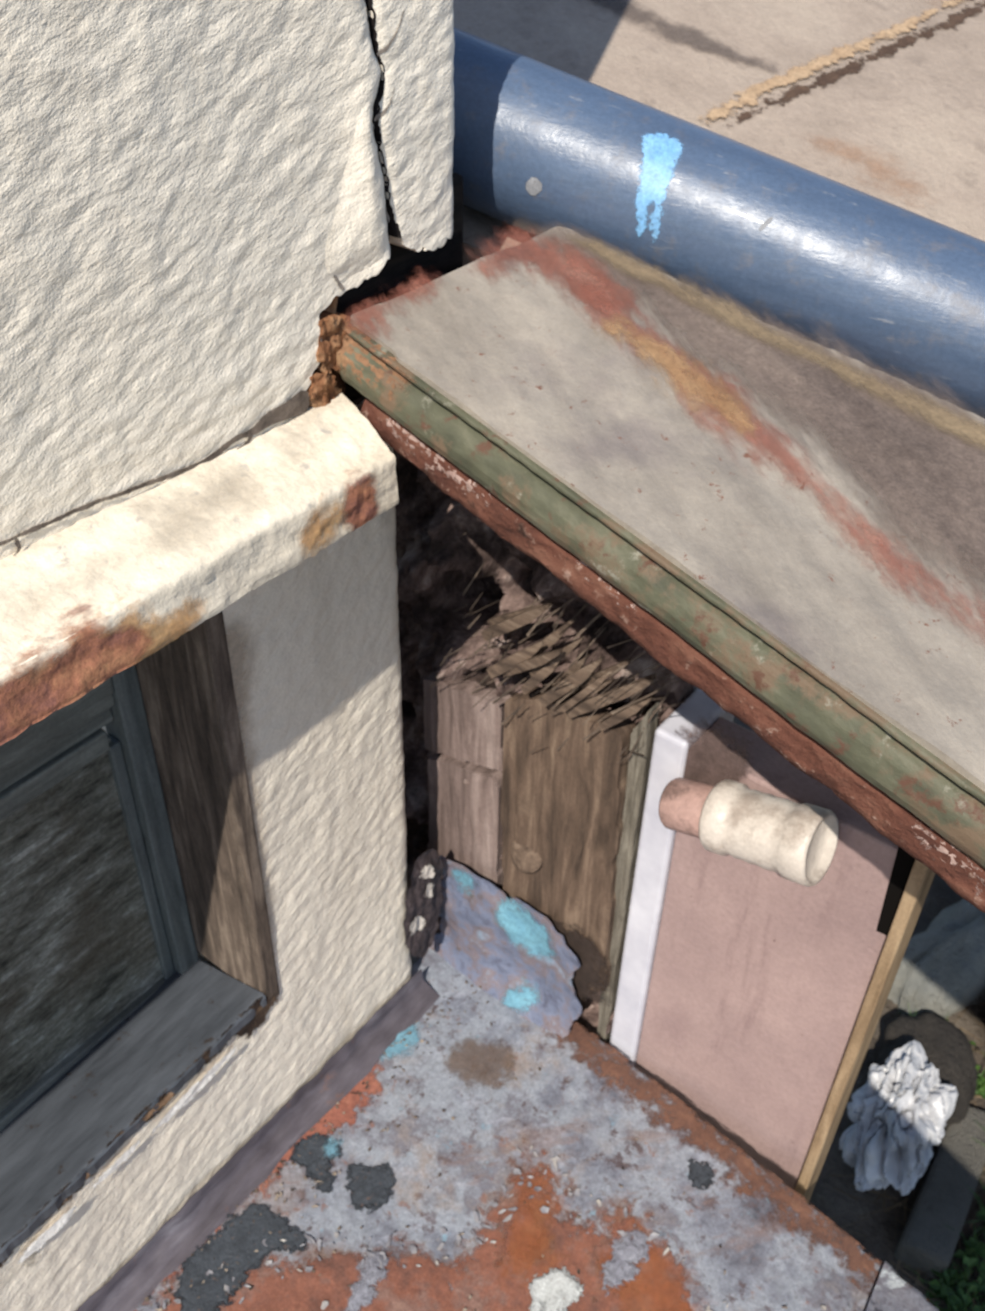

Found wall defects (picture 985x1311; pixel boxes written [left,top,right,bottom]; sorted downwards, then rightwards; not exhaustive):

crack [365,0,405,240]
crack [334,275,345,290]
rust [400,277,431,297]
rust [480,230,925,580]
rust [302,476,378,550]
rust [0,604,199,746]
rust [256,1064,384,1197]
rust [555,1021,884,1290]
rust [134,1262,185,1311]
rust [206,1146,729,1311]